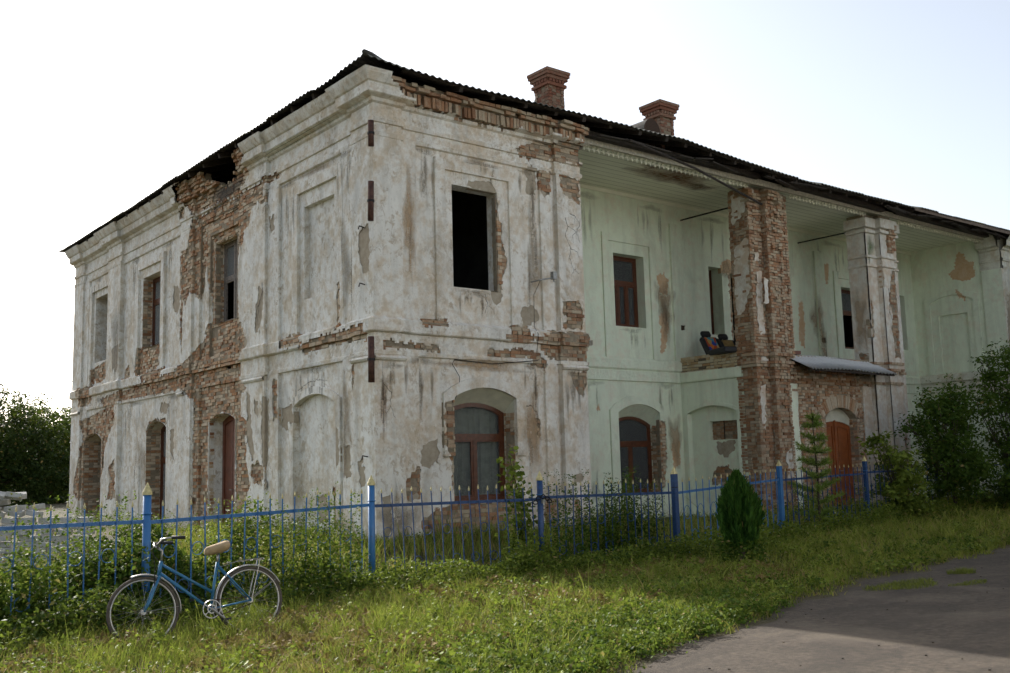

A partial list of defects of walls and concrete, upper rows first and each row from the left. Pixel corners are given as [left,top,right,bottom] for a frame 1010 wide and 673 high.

flaking render [73,171,299,531]
flaking render [465,181,507,305]
water stain [658,291,671,331]
flaking render [712,187,869,517]
peeling [948,248,977,301]
flaking render [406,400,526,538]